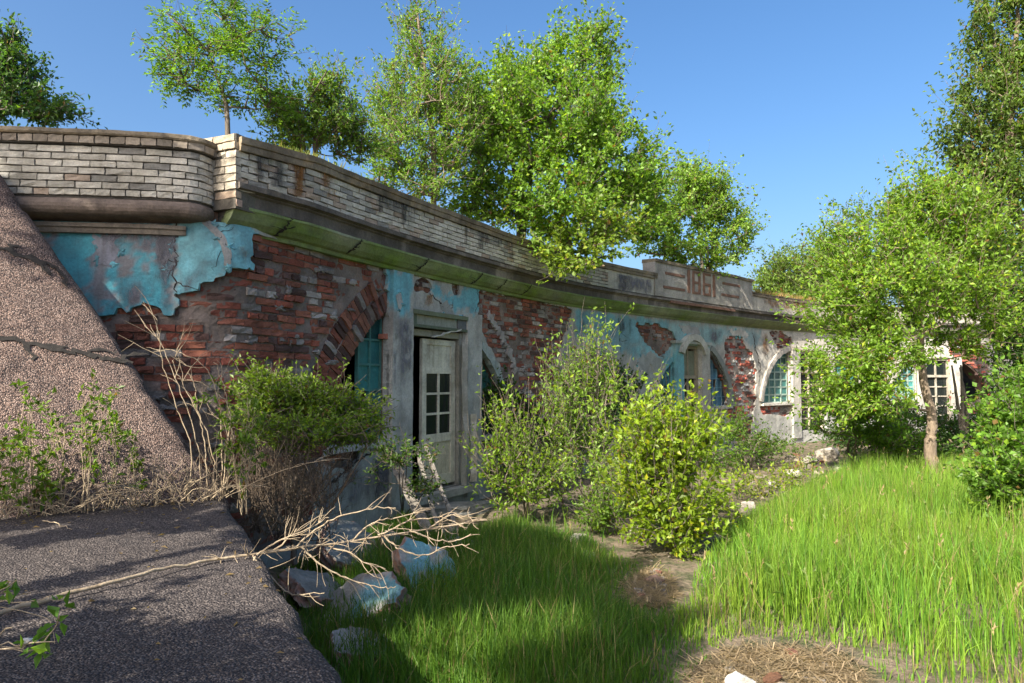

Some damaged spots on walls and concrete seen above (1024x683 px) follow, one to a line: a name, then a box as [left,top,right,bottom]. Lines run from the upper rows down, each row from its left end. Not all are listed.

peeling [91,234,125,268]
crack [161,223,233,293]
crack [273,218,295,236]
crack [0,336,148,363]
spalling [99,219,435,552]
spalling [477,291,572,445]
spalling [635,322,675,389]
spalling [715,328,792,441]